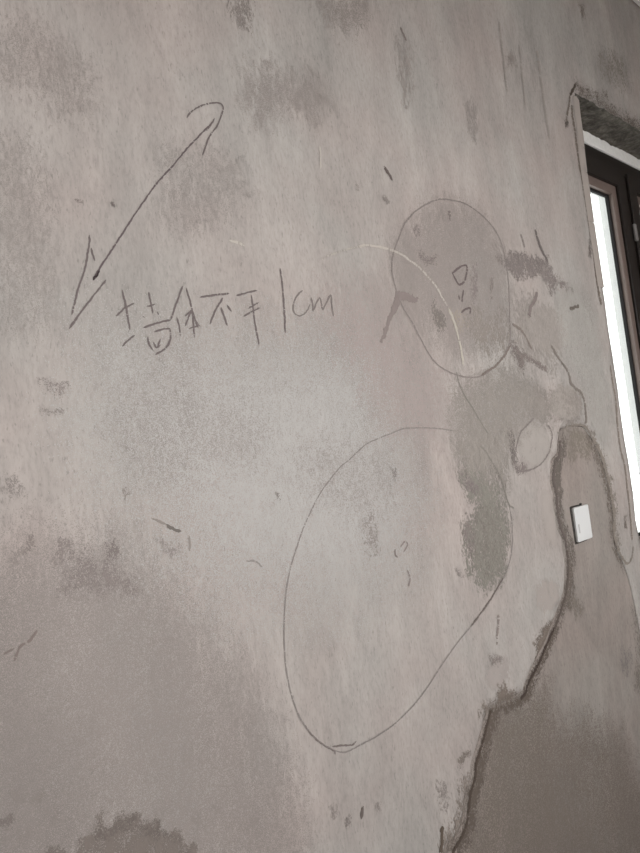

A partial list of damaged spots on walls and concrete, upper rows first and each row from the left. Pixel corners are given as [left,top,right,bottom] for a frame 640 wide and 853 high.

water stain [379,186,627,597]